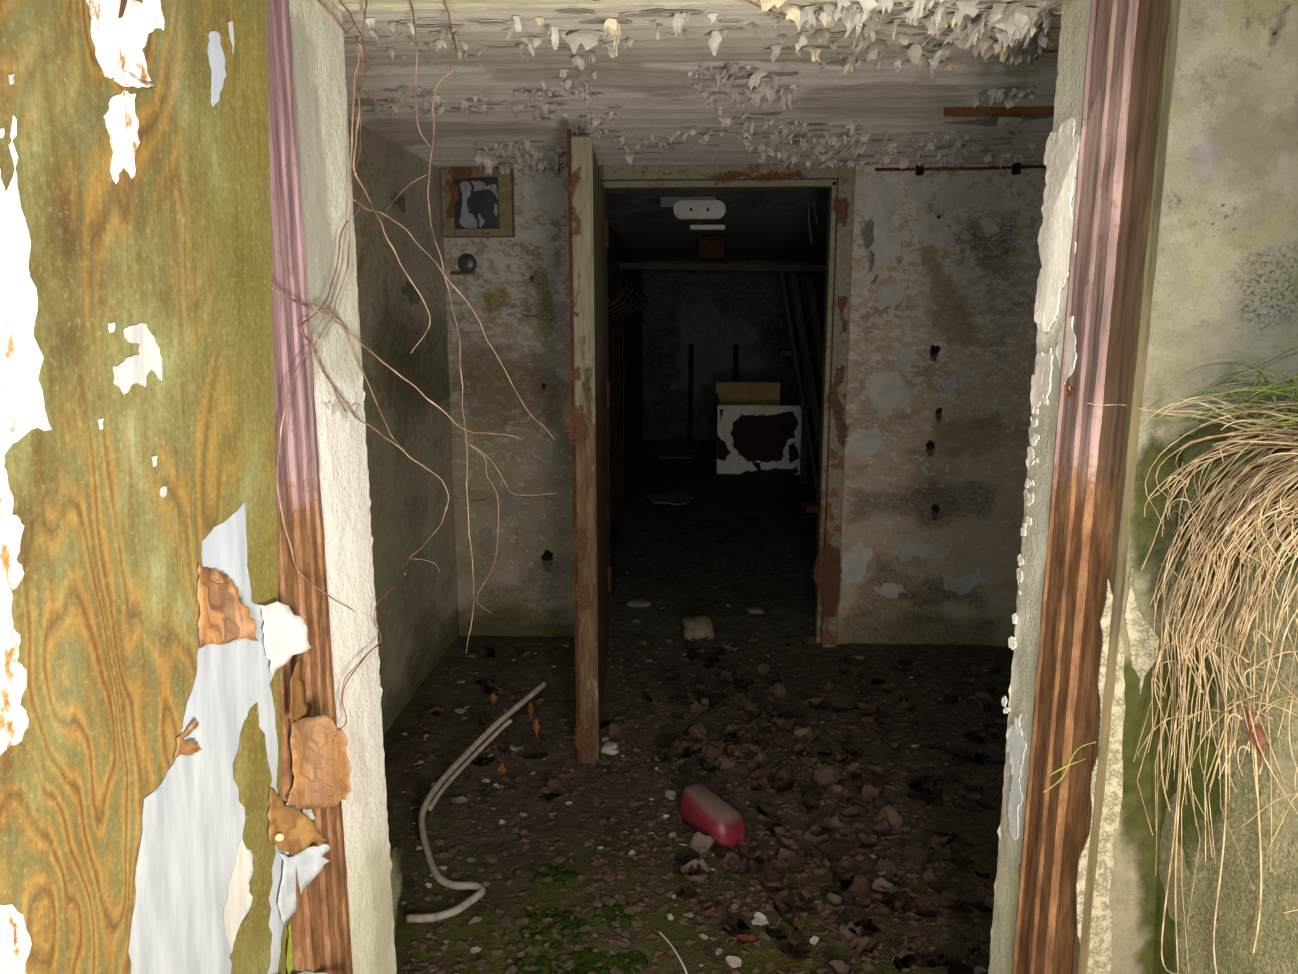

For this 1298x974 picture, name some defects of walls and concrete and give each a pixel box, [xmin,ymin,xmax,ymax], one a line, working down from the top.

peeling [86,0,165,184]
peeling [344,0,1080,536]
damp [861,221,879,283]
peeling [108,322,162,394]
corrosion [826,365,849,448]
corrosion [814,542,842,617]
peeling [1016,554,1024,595]
peeling [1008,613,1017,650]
peeling [128,502,351,974]